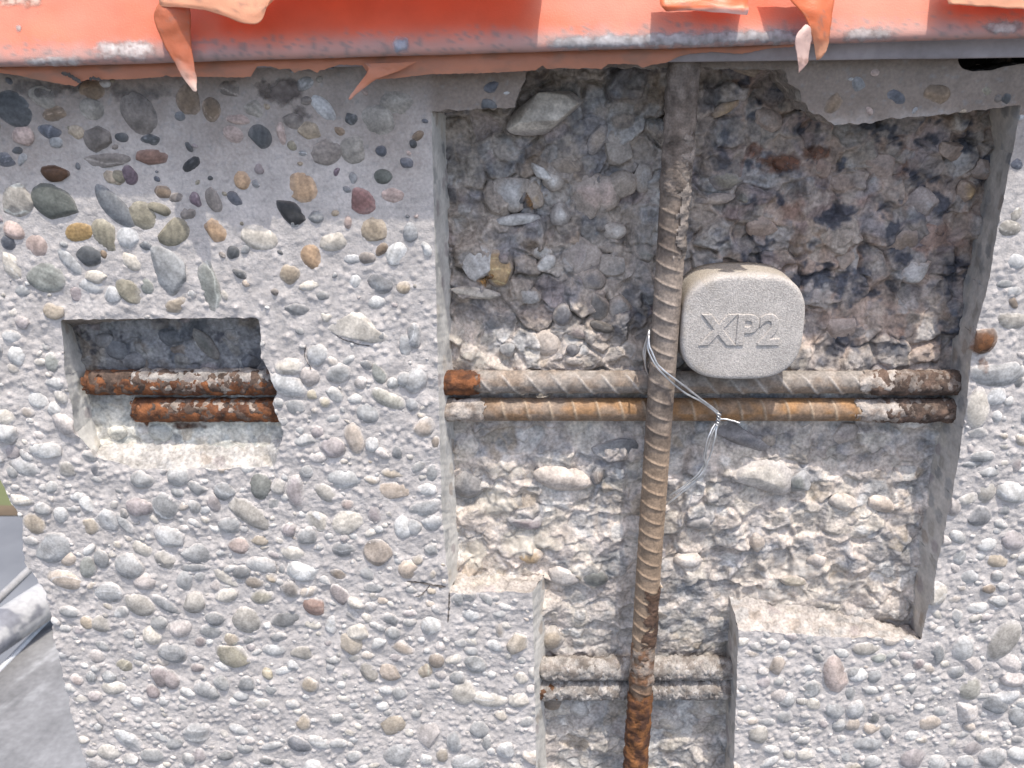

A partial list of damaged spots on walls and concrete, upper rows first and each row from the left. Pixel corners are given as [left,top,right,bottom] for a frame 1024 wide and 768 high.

peeling [0,0,835,100]
peeling [947,0,1024,9]
spalling [61,317,284,470]
spalling [431,62,1021,768]